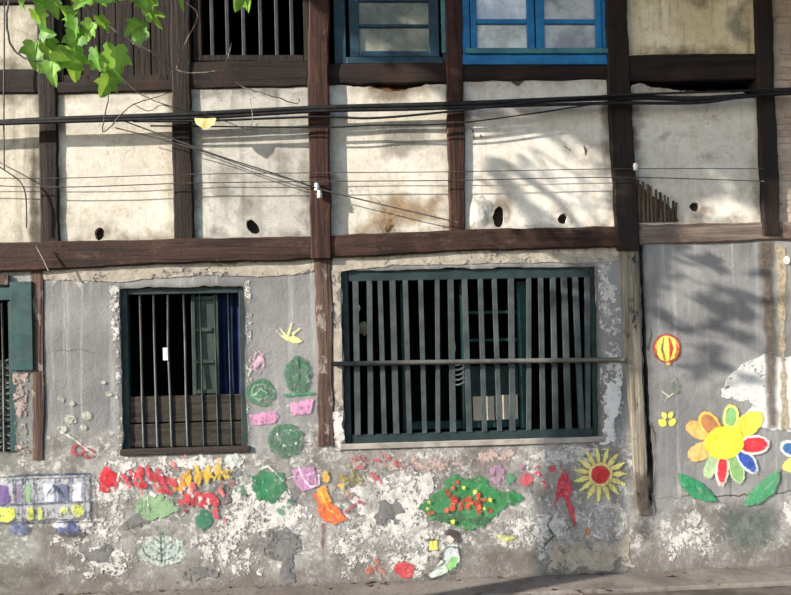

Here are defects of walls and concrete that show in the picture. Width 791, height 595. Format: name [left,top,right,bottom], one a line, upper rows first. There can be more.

flaking render [633,84,741,96]
peeling [721,353,791,432]
leakage [759,243,789,430]
peeling [330,411,515,579]